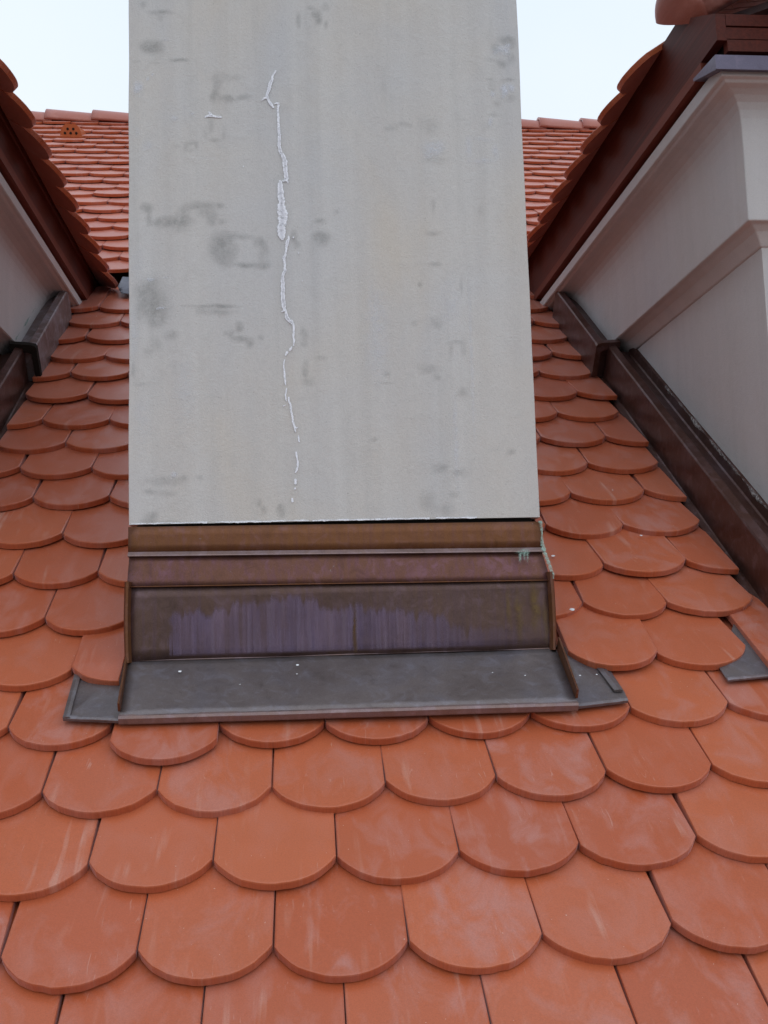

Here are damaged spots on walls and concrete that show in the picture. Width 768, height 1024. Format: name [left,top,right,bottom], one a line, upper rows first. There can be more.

crack [261,70,303,502]